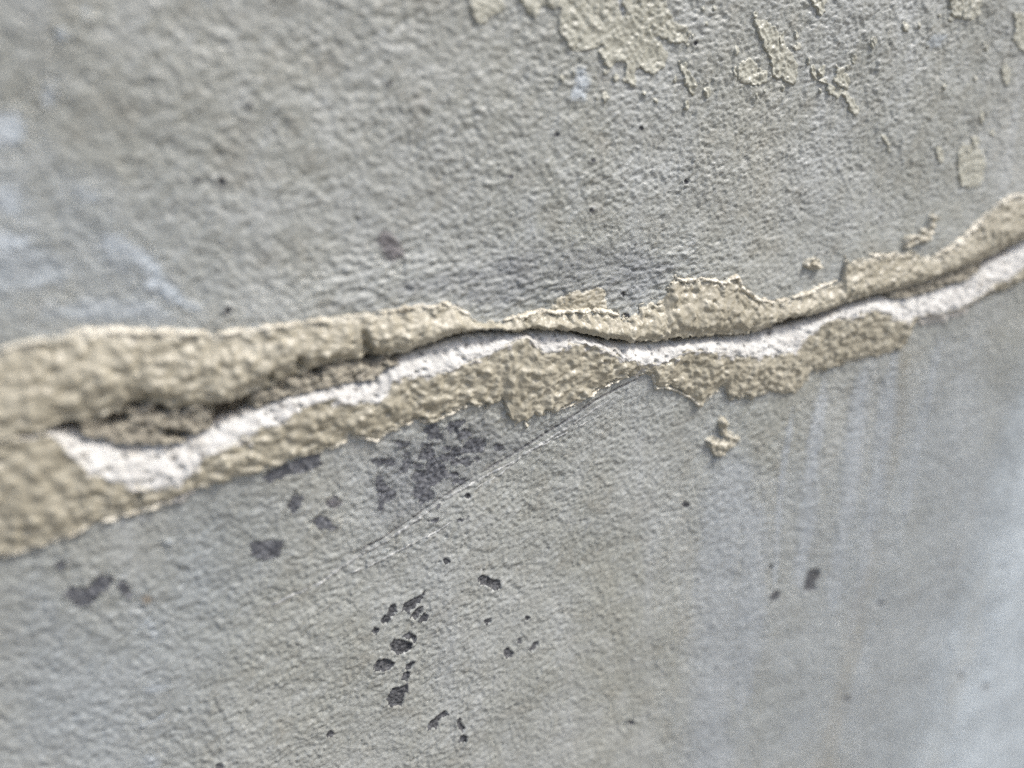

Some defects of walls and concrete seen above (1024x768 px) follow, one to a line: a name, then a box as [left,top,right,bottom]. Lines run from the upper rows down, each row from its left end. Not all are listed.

peeling [469,0,504,25]
peeling [938,0,983,22]
peeling [519,0,711,110]
peeling [732,11,859,116]
peeling [935,108,995,188]
peeling [901,212,942,249]
crack [0,239,1024,506]
peeling [705,416,740,458]